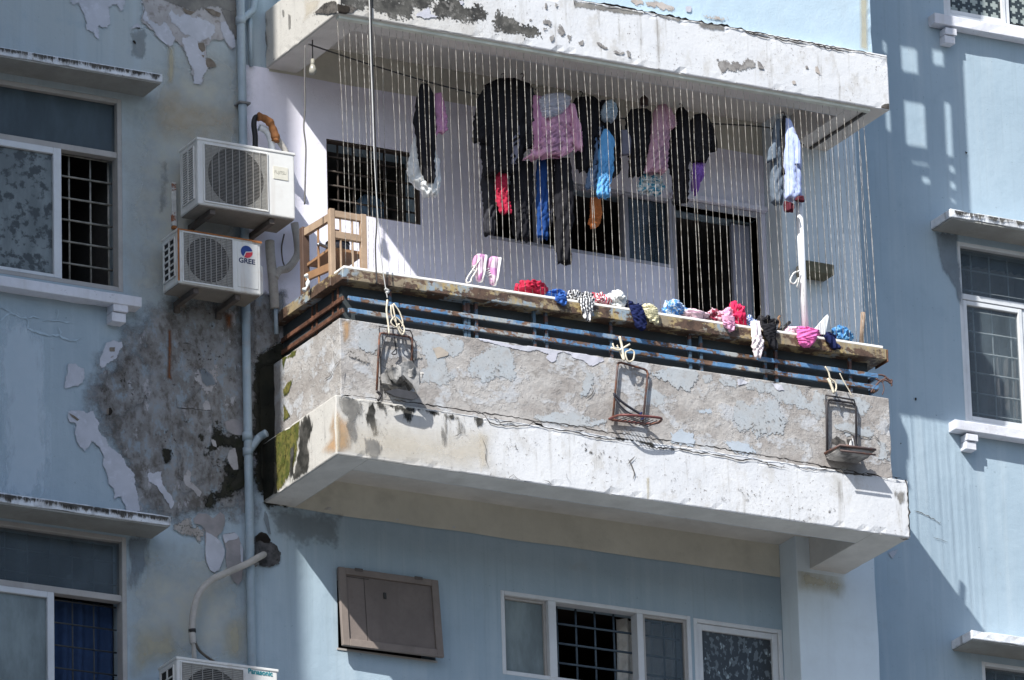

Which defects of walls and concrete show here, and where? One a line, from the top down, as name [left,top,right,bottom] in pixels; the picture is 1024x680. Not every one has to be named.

leakage [0,48,160,79]
peeling [131,0,237,85]
spalling [315,1,357,15]
peeling [100,340,123,368]
peeling [347,328,400,369]
peeling [413,332,604,397]
peeling [68,407,174,512]
leakage [0,291,313,522]
leakage [339,397,465,457]
crack [324,362,944,541]
peeling [638,367,890,461]
peeling [174,512,281,585]